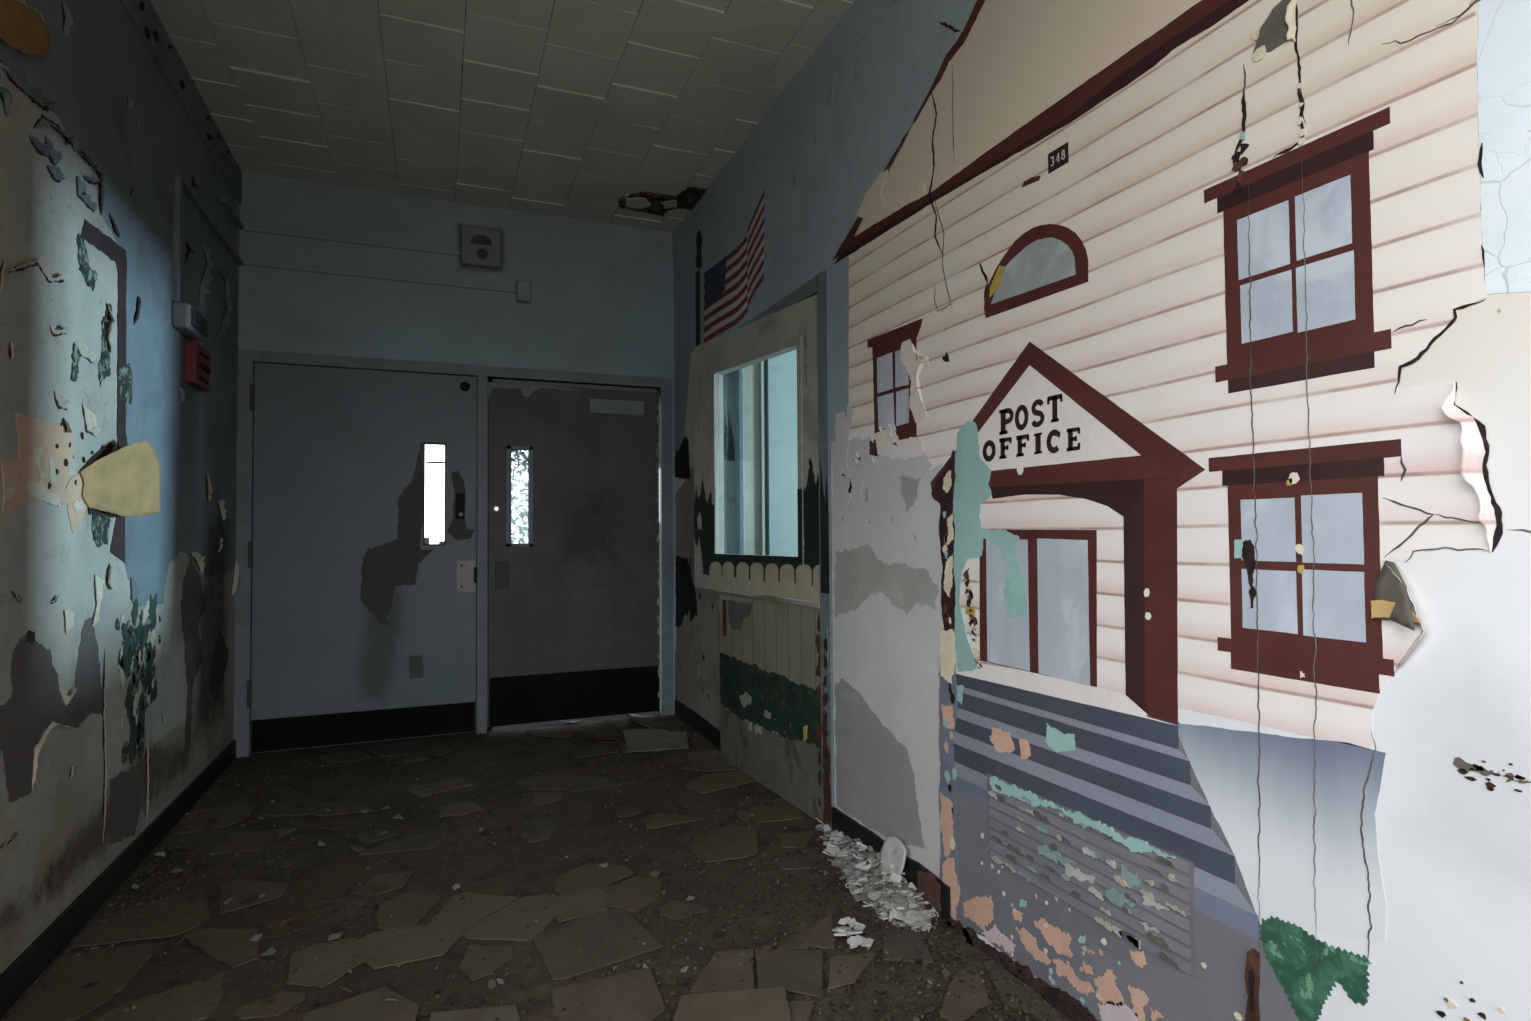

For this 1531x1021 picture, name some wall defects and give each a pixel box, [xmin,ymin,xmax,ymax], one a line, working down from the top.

crack [1348,0,1480,45]
crack [1476,142,1484,178]
crack [1393,245,1485,393]
peeling [1,391,160,533]
peeling [360,442,433,625]
peeling [1234,539,1256,608]
crack [1231,3,1317,975]
crack [1382,455,1531,561]
peeling [0,563,162,844]
peeling [834,339,1186,1021]
crack [1360,731,1376,970]
spalling [552,926,934,1021]